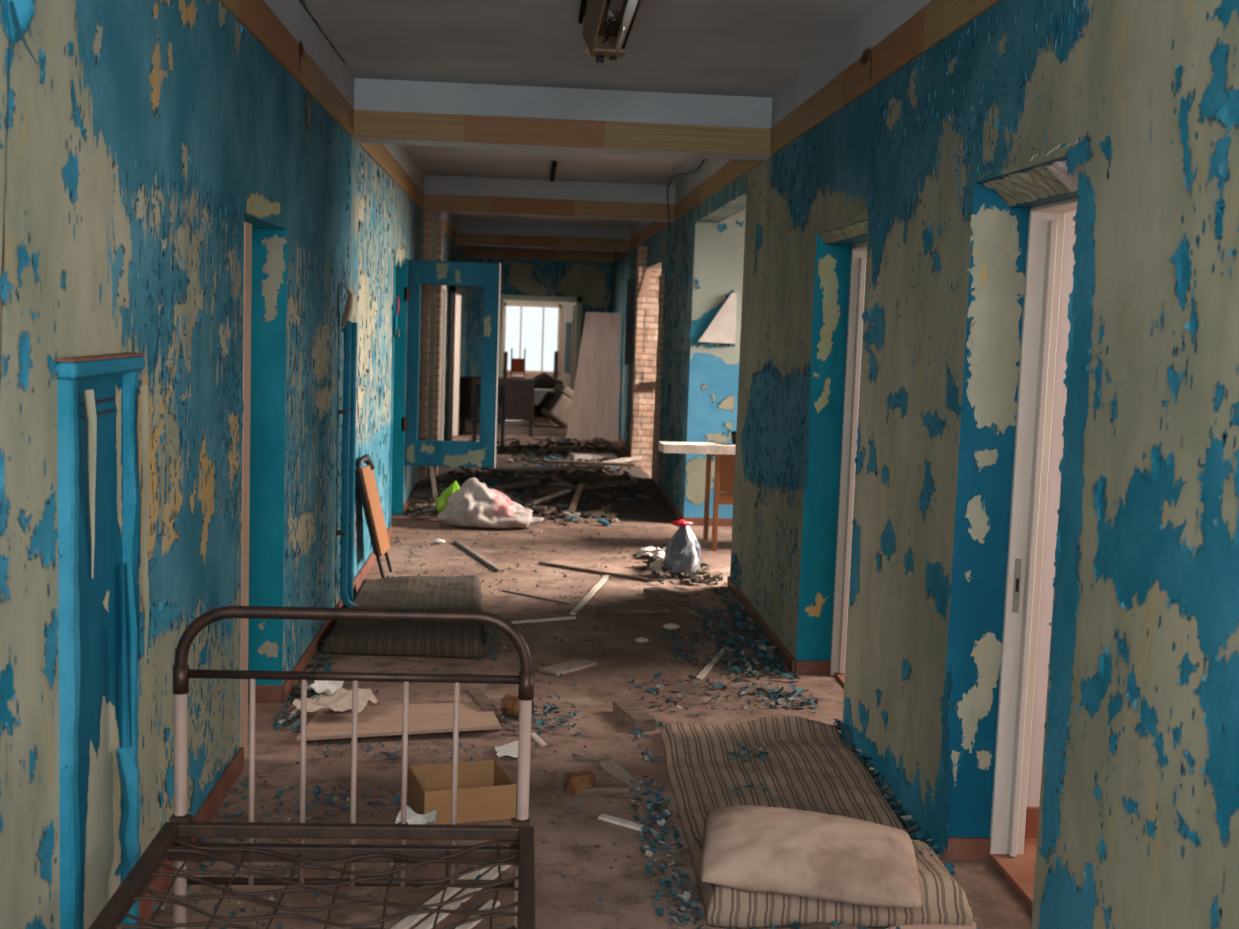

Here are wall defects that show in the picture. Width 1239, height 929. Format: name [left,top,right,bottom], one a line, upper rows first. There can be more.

peeling [0,0,37,148]
peeling [29,28,77,94]
peeling [149,0,245,118]
peeling [62,81,87,240]
peeling [0,210,58,414]
peeling [0,447,59,713]
peeling [83,130,280,929]
peeling [257,116,406,671]
peeling [444,286,466,418]
peeling [639,0,1239,929]
peeling [0,647,41,796]
peeling [25,820,57,929]